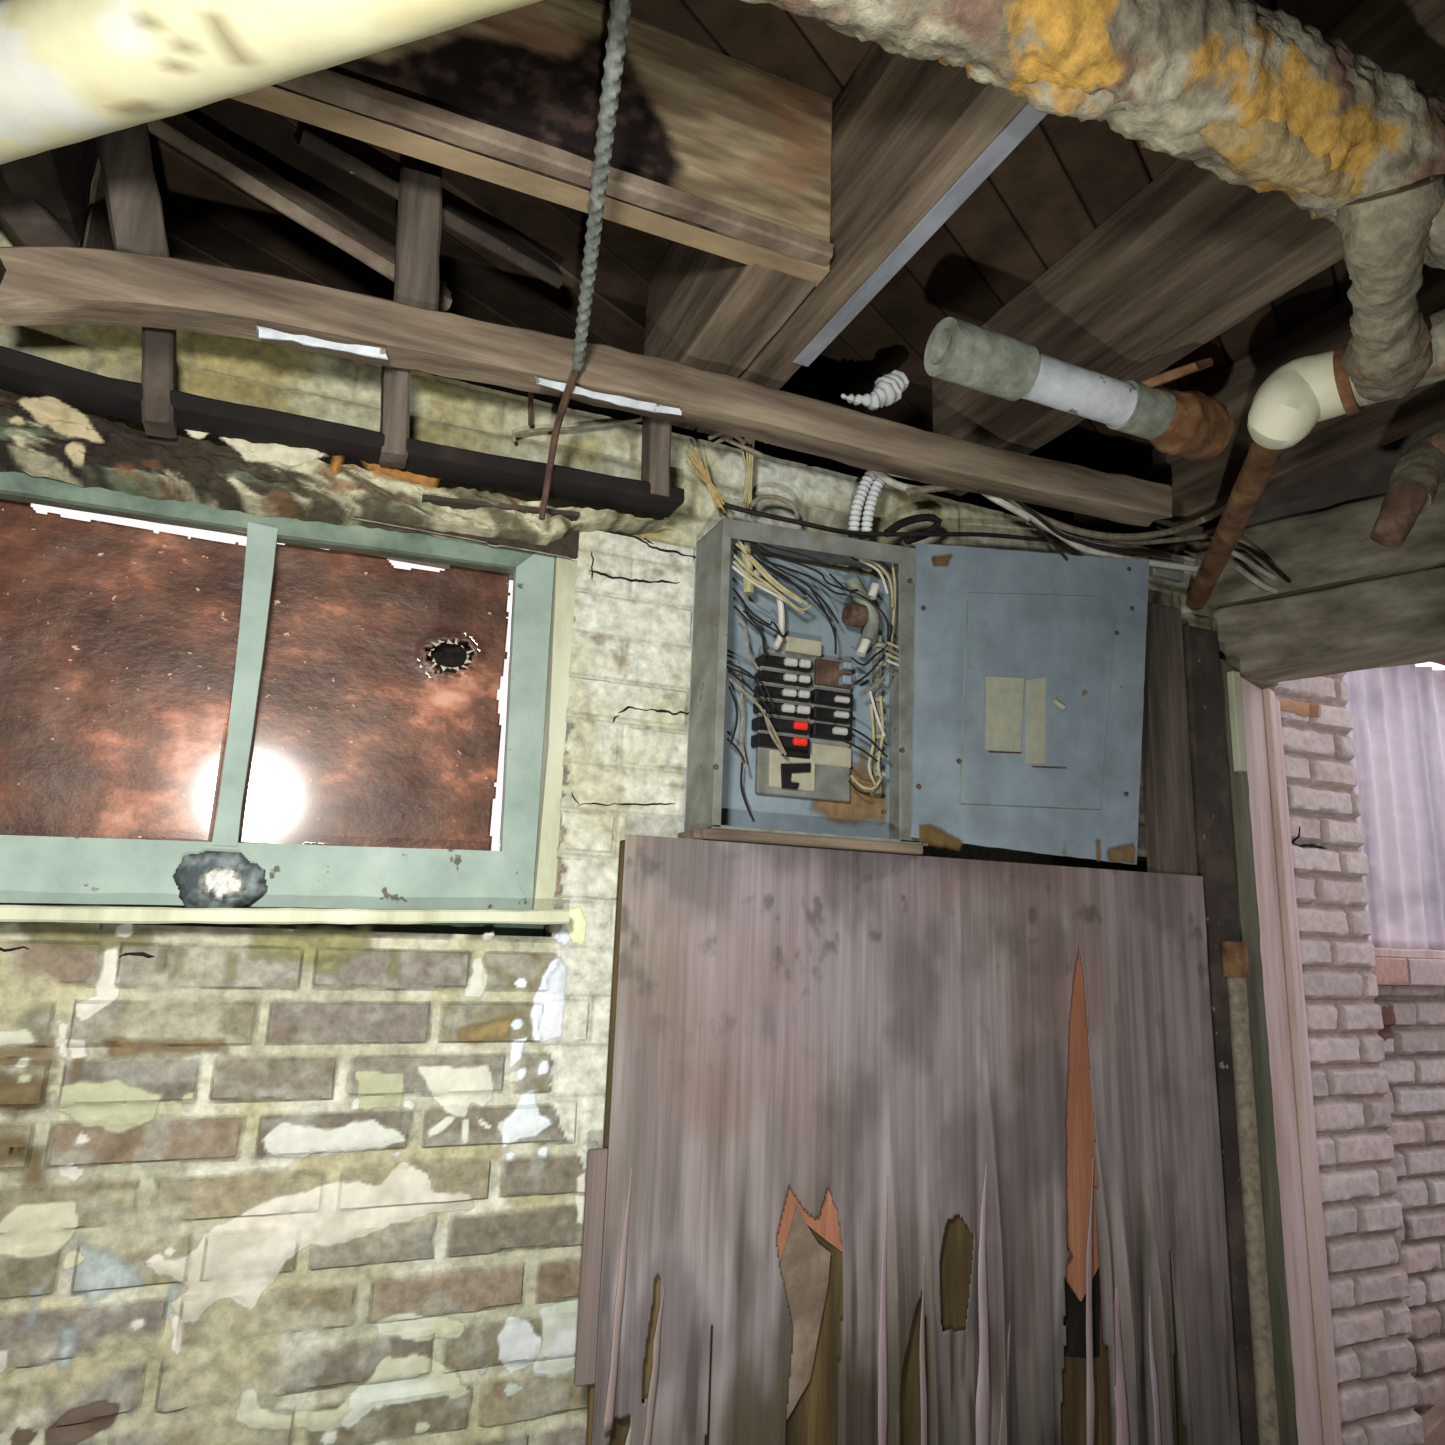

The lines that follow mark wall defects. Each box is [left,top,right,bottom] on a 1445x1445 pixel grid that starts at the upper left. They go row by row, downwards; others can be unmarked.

peeling [10,397,103,466]
peeling [187,430,325,466]
crack [613,706,689,722]
crack [0,945,29,953]
crack [119,951,155,959]
peeling [0,907,586,1356]
peeling [59,1327,75,1368]
peeling [477,1299,579,1396]
peeling [235,1313,471,1445]
spalling [11,1400,119,1445]